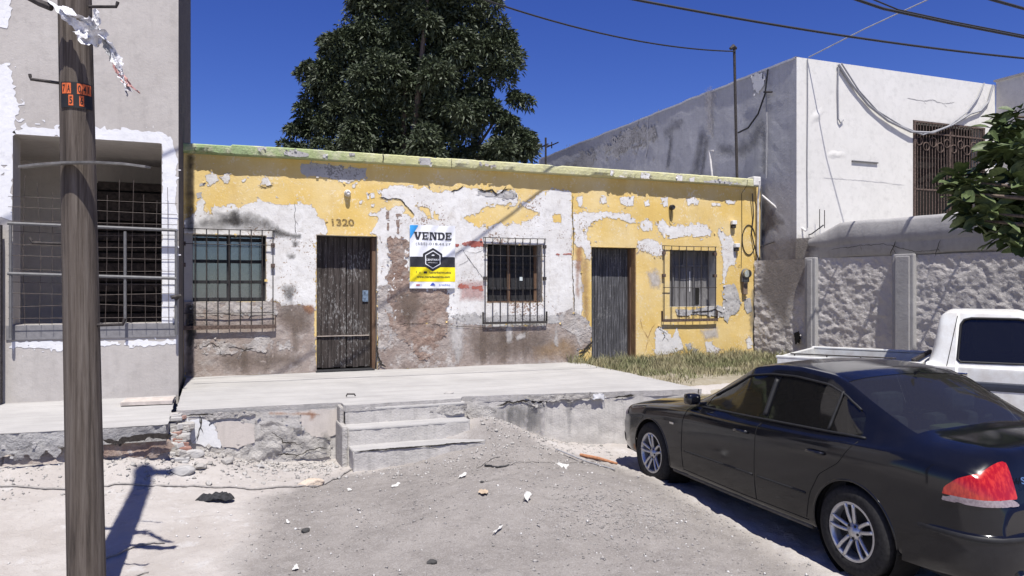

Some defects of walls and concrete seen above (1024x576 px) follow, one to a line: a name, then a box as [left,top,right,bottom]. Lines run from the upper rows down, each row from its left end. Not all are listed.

peeling [184,169,328,377]
peeling [284,148,752,370]
efflorescence [449,320,462,359]
leakage [475,325,558,353]
spalling [525,392,606,408]
spalling [206,416,333,462]